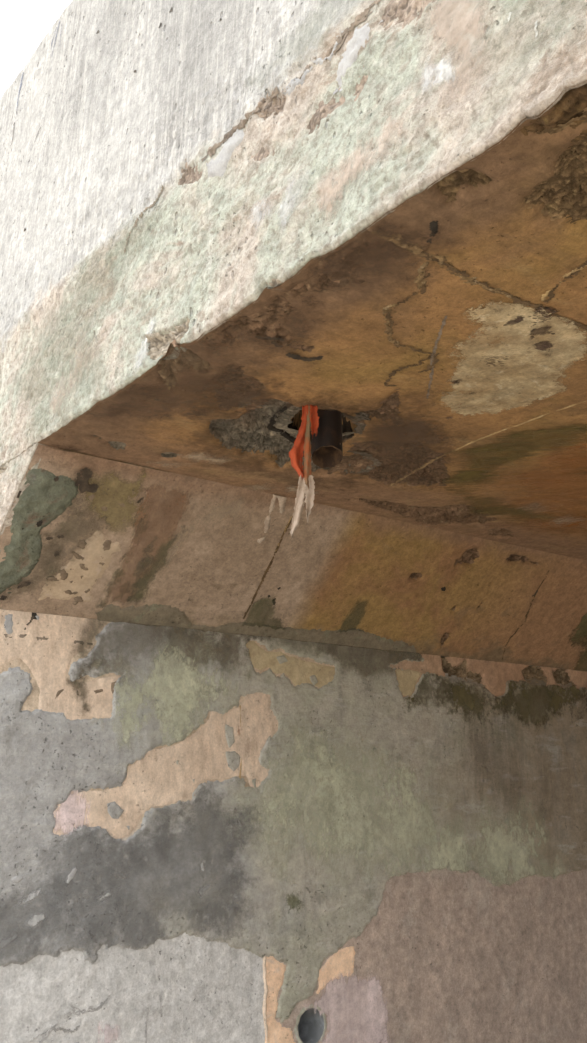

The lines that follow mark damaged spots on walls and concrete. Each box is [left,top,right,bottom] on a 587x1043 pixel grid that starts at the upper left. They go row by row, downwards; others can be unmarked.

spalling [520,84,587,143]
crack [371,229,587,399]
leakage [441,302,587,419]
spalling [209,397,330,472]
spalling [342,412,382,474]
leakage [419,426,587,521]
peeling [0,530,128,720]
peeling [246,641,335,688]
peeling [53,692,278,840]
leakage [0,797,250,958]
peeling [262,956,296,1043]
peeling [314,946,388,1043]